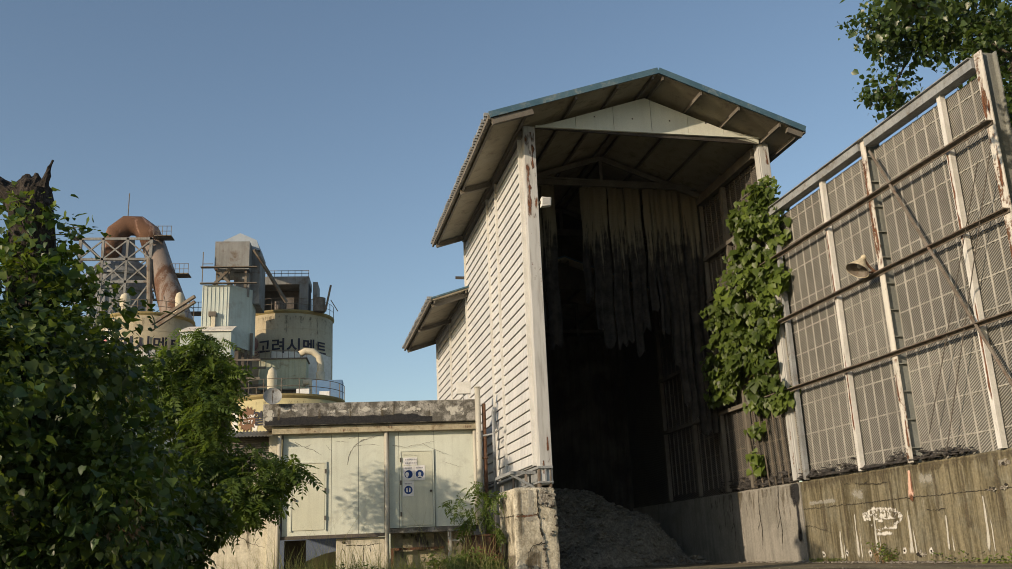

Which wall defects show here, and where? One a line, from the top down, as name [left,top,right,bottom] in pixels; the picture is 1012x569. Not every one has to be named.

rust [524,132,537,217]
crack [500,490,549,568]
damp [776,450,1012,569]